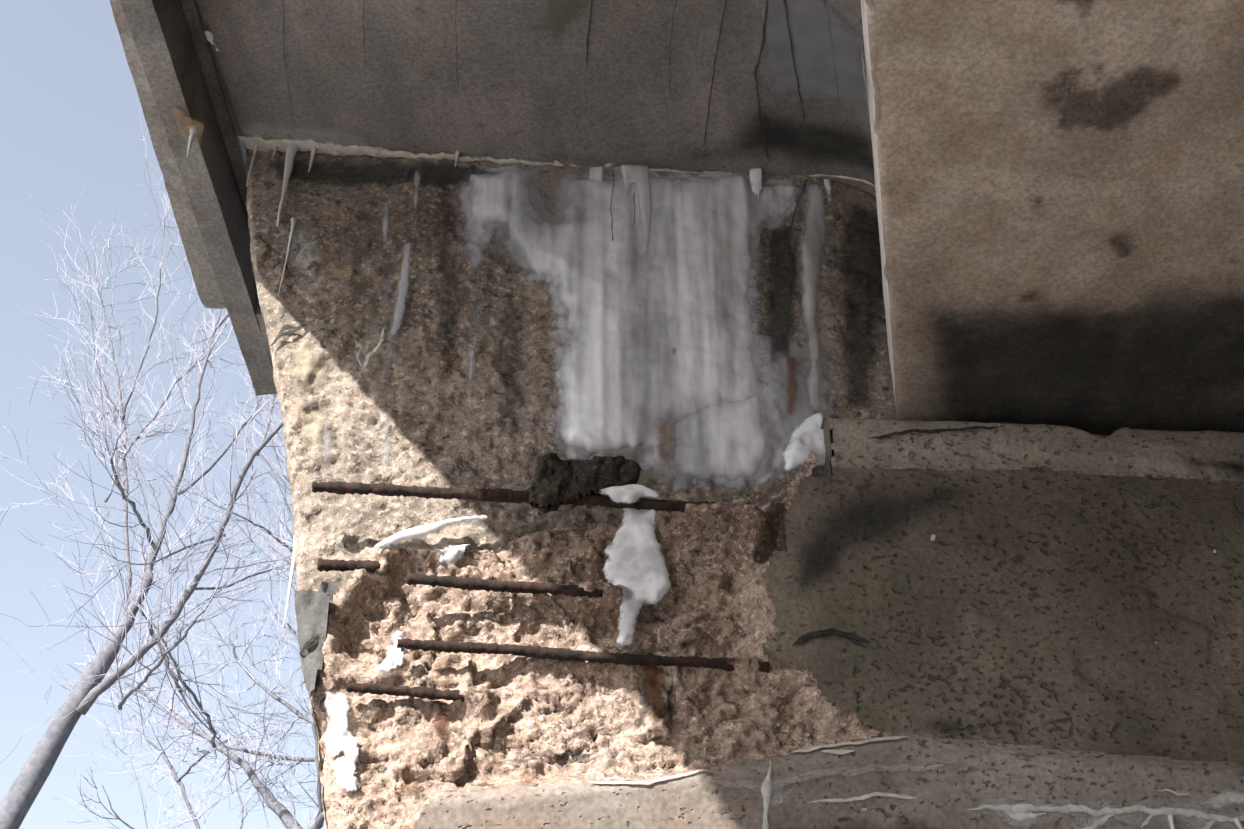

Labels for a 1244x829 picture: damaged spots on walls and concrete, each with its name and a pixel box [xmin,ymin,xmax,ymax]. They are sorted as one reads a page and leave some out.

crack [585,0,593,67]
crack [704,0,727,146]
crack [754,0,805,161]
water stain [1048,70,1176,129]
water stain [742,116,876,201]
water stain [767,227,795,362]
water stain [842,206,883,404]
peeling [289,342,324,386]
peeling [303,412,326,458]
rust [594,540,606,575]
spalling [310,453,891,829]